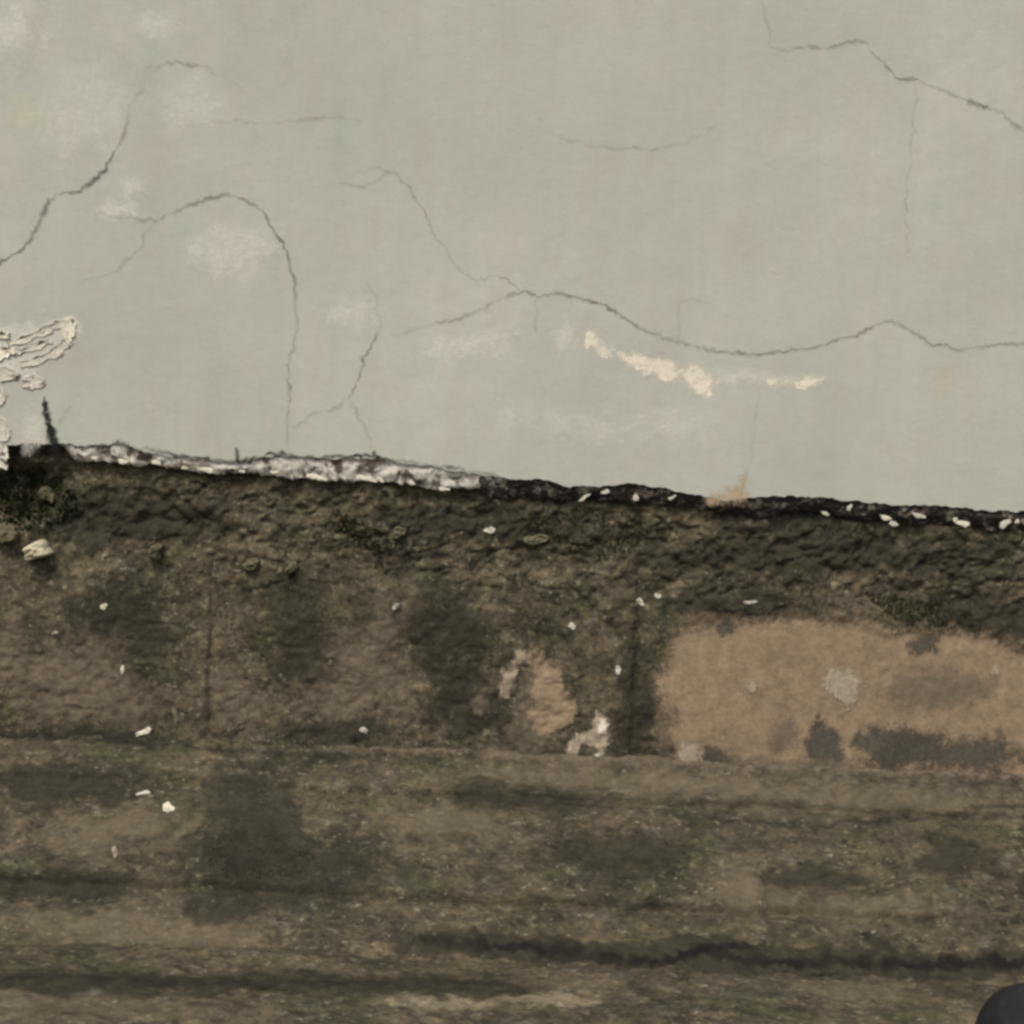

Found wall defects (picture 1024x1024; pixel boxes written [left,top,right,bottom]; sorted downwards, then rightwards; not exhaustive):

peeling [0,317,77,471]
crack [42,400,58,453]
crack [171,449,286,462]
crack [314,451,392,462]
spalling [60,443,1024,532]
peeling [471,643,577,736]